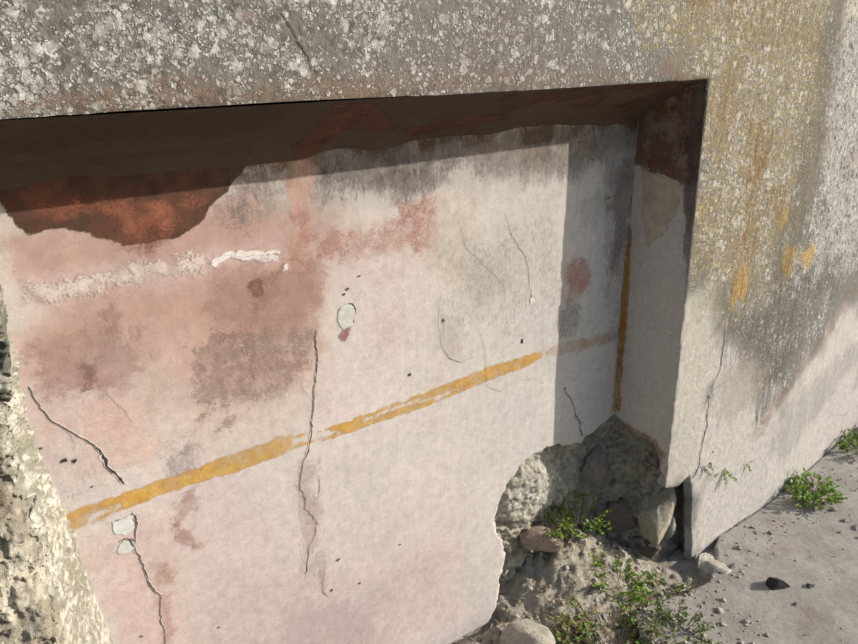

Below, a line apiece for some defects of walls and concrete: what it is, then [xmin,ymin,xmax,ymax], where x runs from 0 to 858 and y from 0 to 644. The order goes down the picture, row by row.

crack [29,386,125,485]
spalling [113,515,137,555]
crack [119,513,166,644]
crack [299,330,328,596]
spalling [494,414,684,586]
crack [693,329,726,478]